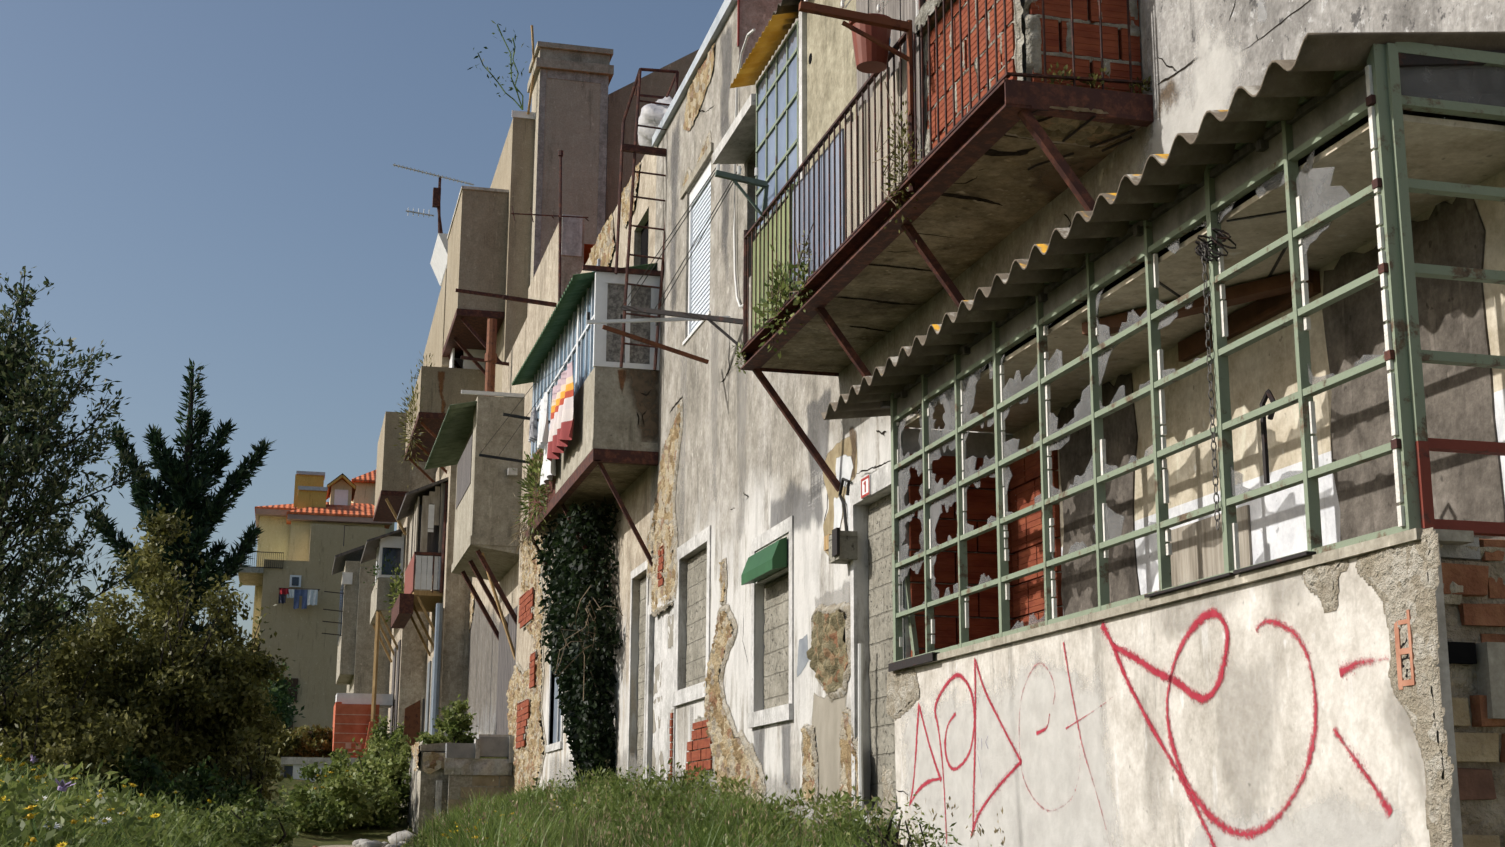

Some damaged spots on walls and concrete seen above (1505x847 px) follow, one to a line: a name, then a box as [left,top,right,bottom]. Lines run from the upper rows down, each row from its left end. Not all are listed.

flaking render [683,43,715,131]
crack [941,134,1070,206]
crack [837,231,952,351]
flaking render [506,527,547,795]
flaking render [646,398,767,811]
flaking render [797,601,859,838]
flaking render [1302,527,1454,847]